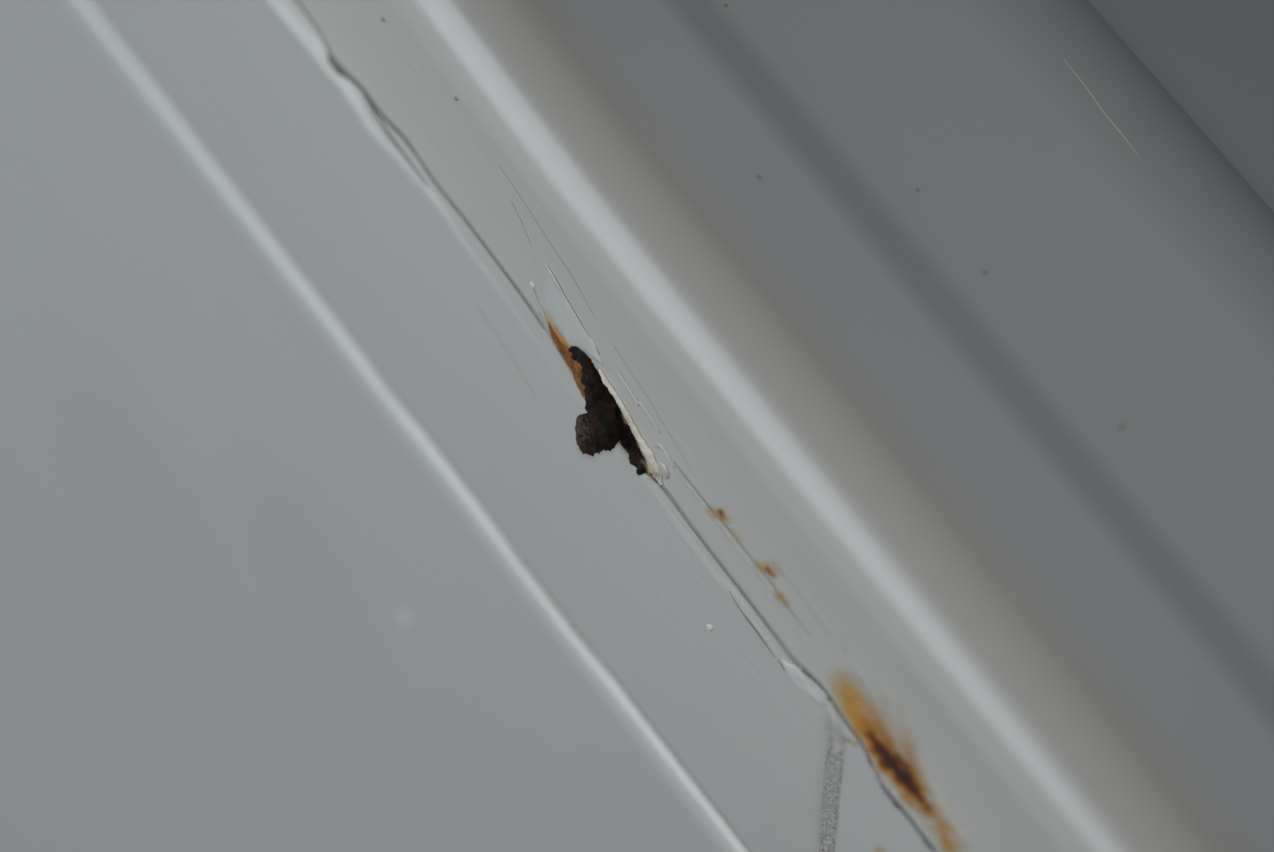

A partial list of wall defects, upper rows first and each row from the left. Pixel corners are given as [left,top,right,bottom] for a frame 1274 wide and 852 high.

crack [295,0,543,328]
peeling [533,266,663,485]
crack [645,473,935,852]
rust [837,680,955,852]